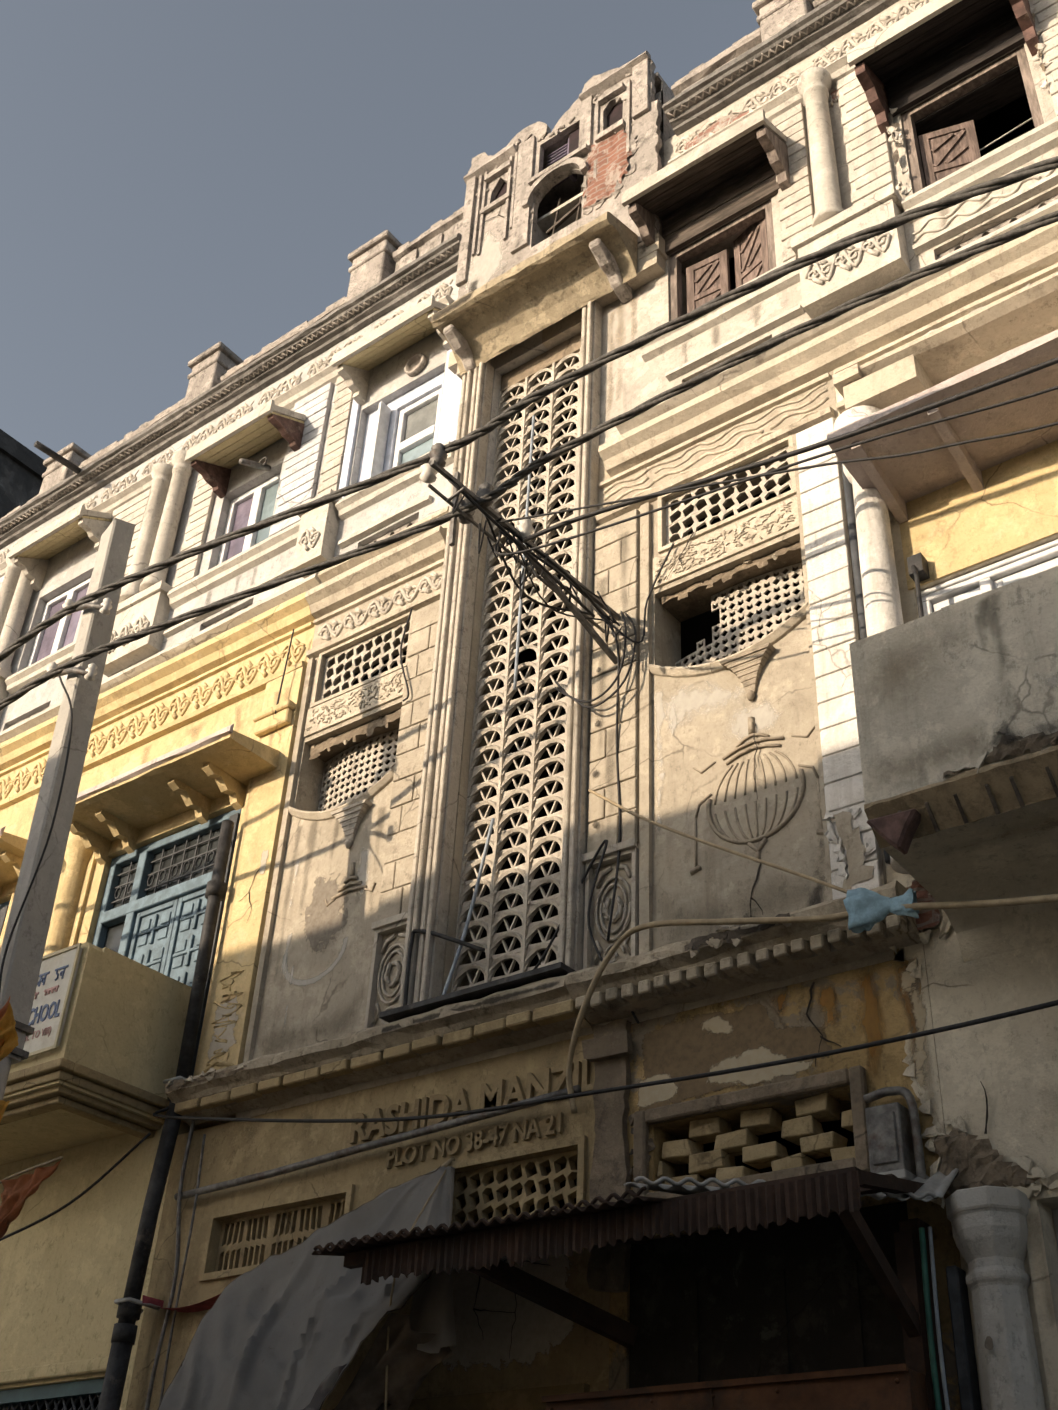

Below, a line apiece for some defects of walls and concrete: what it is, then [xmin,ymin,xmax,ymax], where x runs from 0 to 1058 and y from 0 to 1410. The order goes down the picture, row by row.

spalling [580,123,638,215]
spalling [943,727,1058,779]
crack [806,982,842,1067]
spalling [889,880,1058,1209]
peeling [628,1003,832,1199]